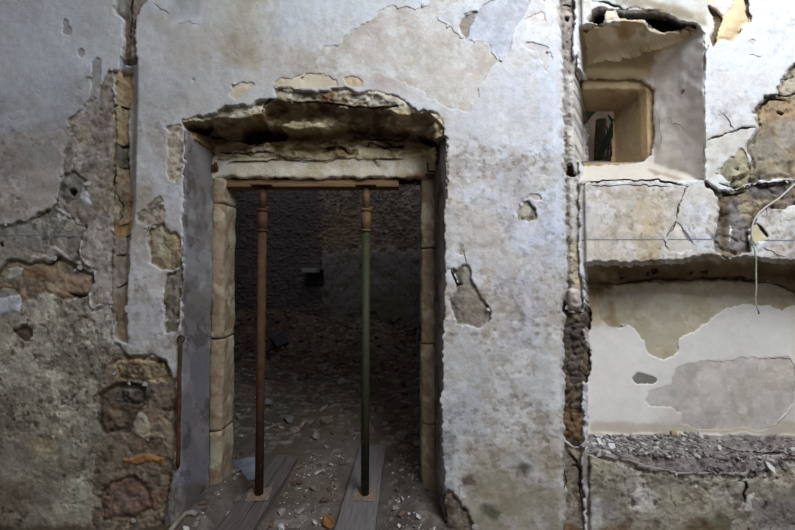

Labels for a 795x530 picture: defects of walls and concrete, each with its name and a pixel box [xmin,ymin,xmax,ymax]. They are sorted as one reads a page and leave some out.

spalling [166,0,546,182]
flaking render [525,42,552,71]
crack [589,95,791,249]
flaking render [707,0,752,47]
spalling [715,66,795,190]
spalling [0,58,183,530]
spalling [447,264,491,328]
crack [596,277,792,291]
flaking render [597,268,795,360]
flaking render [632,356,795,431]